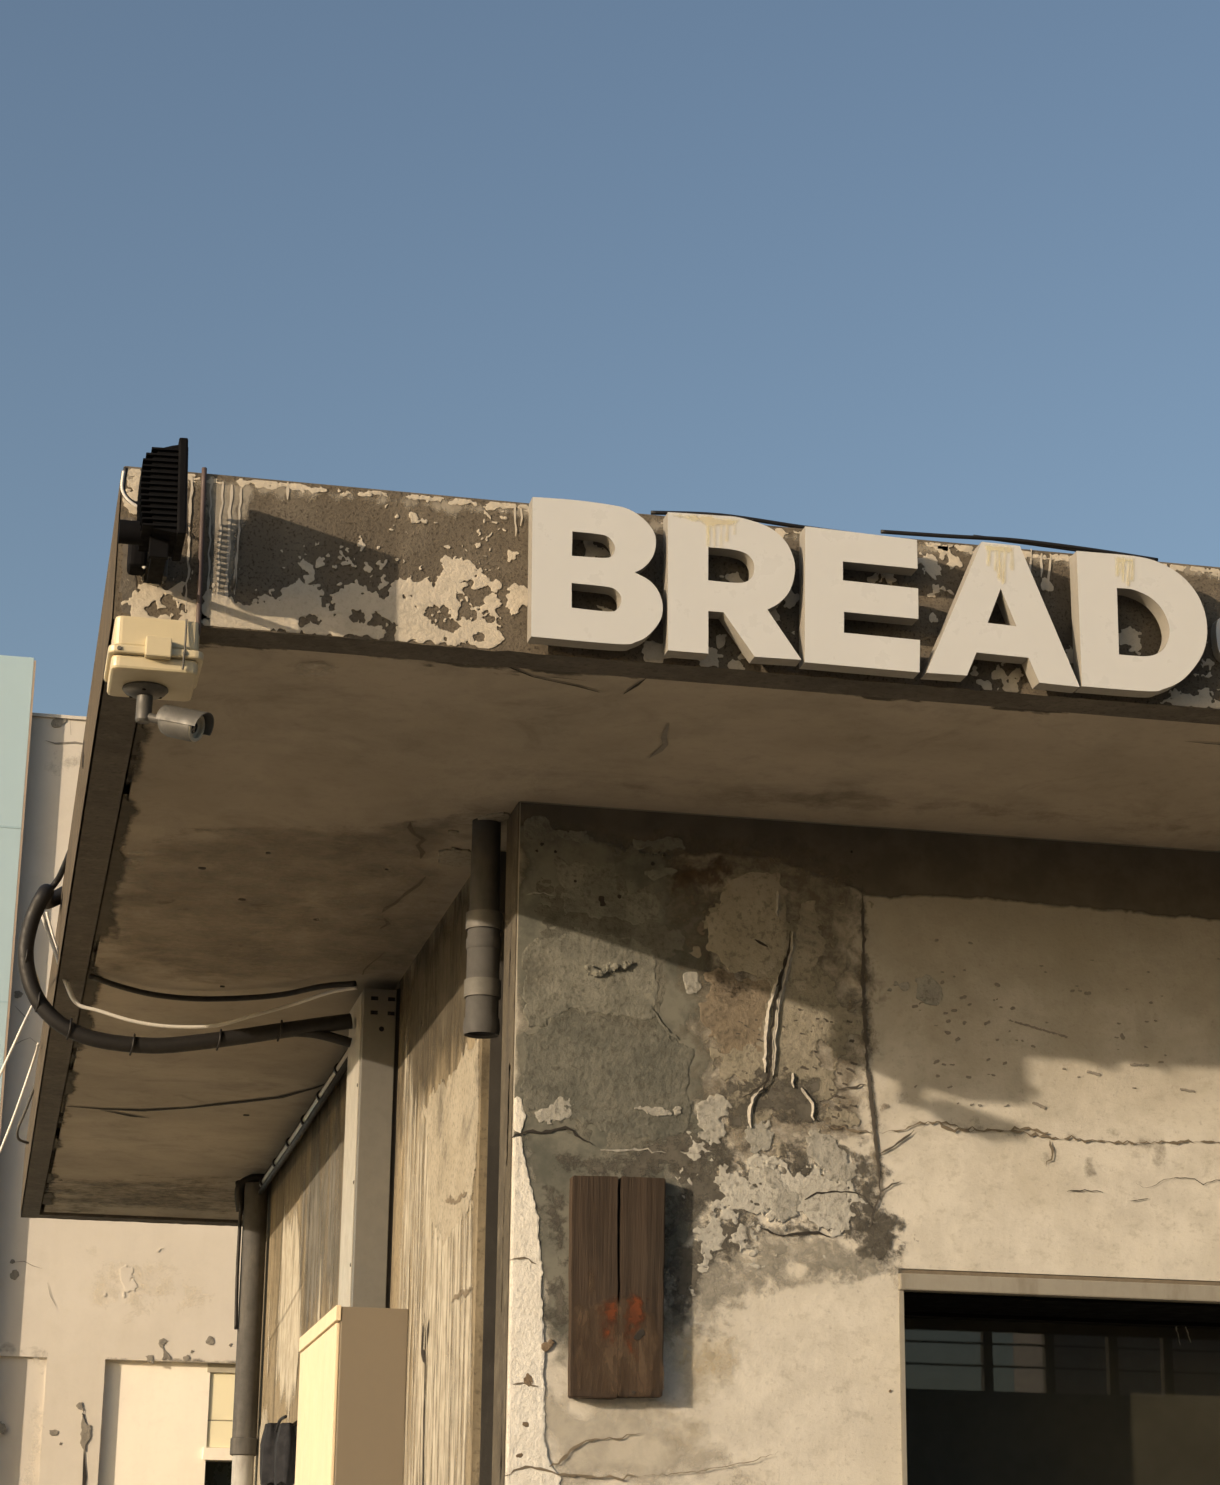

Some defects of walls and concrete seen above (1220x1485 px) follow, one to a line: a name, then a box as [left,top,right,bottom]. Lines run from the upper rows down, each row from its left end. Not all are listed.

leakage [184,475,317,618]
peeling [121,468,529,649]
leakage [405,499,529,536]
peeling [583,540,611,557]
peeling [1022,551,1071,591]
peeling [770,589,799,635]
peeling [699,634,745,670]
peeling [1160,641,1220,709]
flaking render [509,815,872,1273]
crack [742,885,1220,1237]
leakage [42,723,472,1485]
crack [505,1433,769,1480]